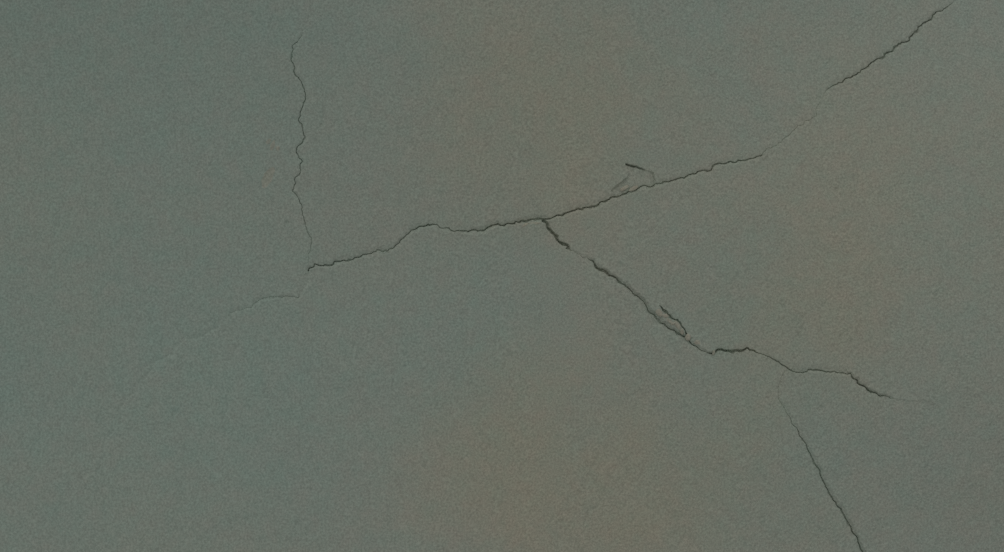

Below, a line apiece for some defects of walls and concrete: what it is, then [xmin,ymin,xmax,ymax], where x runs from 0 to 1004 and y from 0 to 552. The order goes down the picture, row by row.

crack [49,0,541,539]
crack [535,0,970,419]
crack [777,369,871,552]